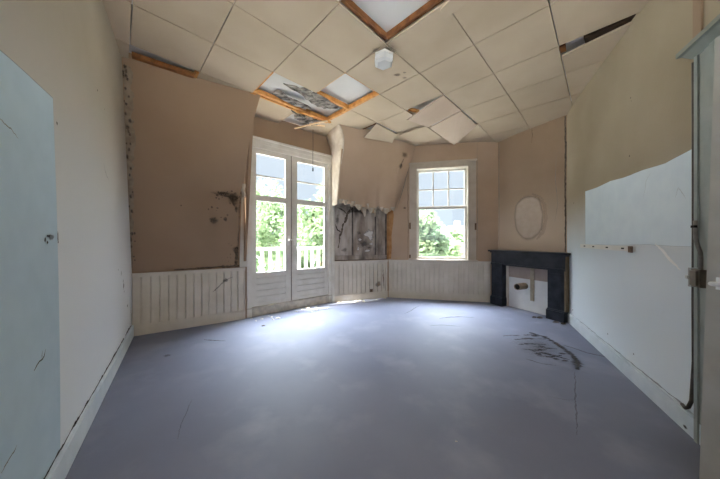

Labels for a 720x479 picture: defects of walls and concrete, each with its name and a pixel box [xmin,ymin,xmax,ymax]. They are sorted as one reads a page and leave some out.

water stain [208,191,242,264]
crack [335,207,352,248]
water stain [508,332,581,370]